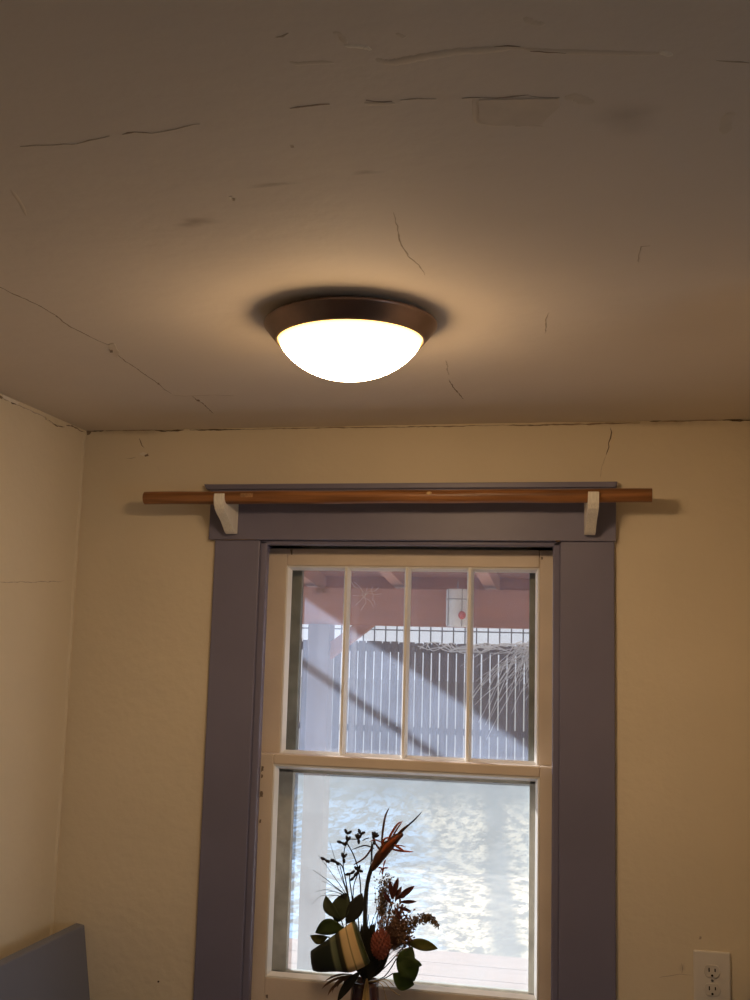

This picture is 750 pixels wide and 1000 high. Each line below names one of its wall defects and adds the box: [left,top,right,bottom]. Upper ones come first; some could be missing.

crack [496,45,566,54]
crack [290,102,330,110]
crack [462,93,560,101]
crack [20,124,198,147]
crack [393,212,425,275]
crack [0,287,750,477]